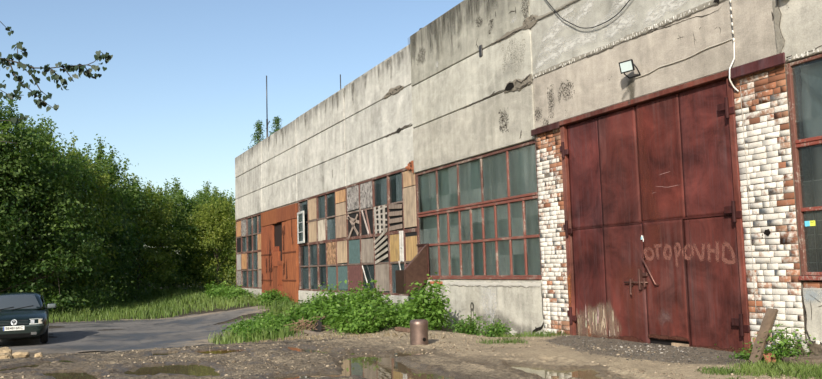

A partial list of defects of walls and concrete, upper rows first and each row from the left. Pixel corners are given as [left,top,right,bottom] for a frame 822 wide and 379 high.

spalling [476,0,580,93]
spalling [383,85,404,99]
peeling [578,306,617,337]